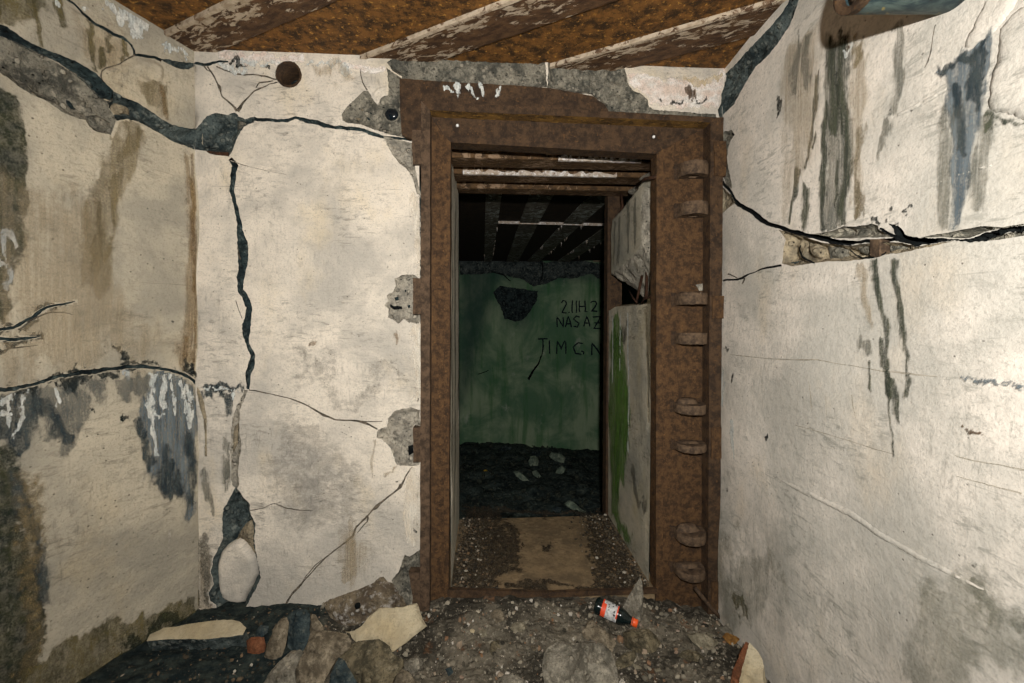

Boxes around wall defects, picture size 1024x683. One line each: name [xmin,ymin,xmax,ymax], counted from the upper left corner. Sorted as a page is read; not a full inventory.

crack [0,0,412,142]
spalling [218,0,799,196]
damp [788,27,864,232]
damp [936,30,1024,229]
crack [0,364,195,392]
damp [0,351,248,683]
peeling [209,486,261,608]
crack [229,159,382,430]
spalling [377,398,420,466]
spalling [385,274,421,324]
crack [722,181,1024,284]
damp [859,258,911,456]